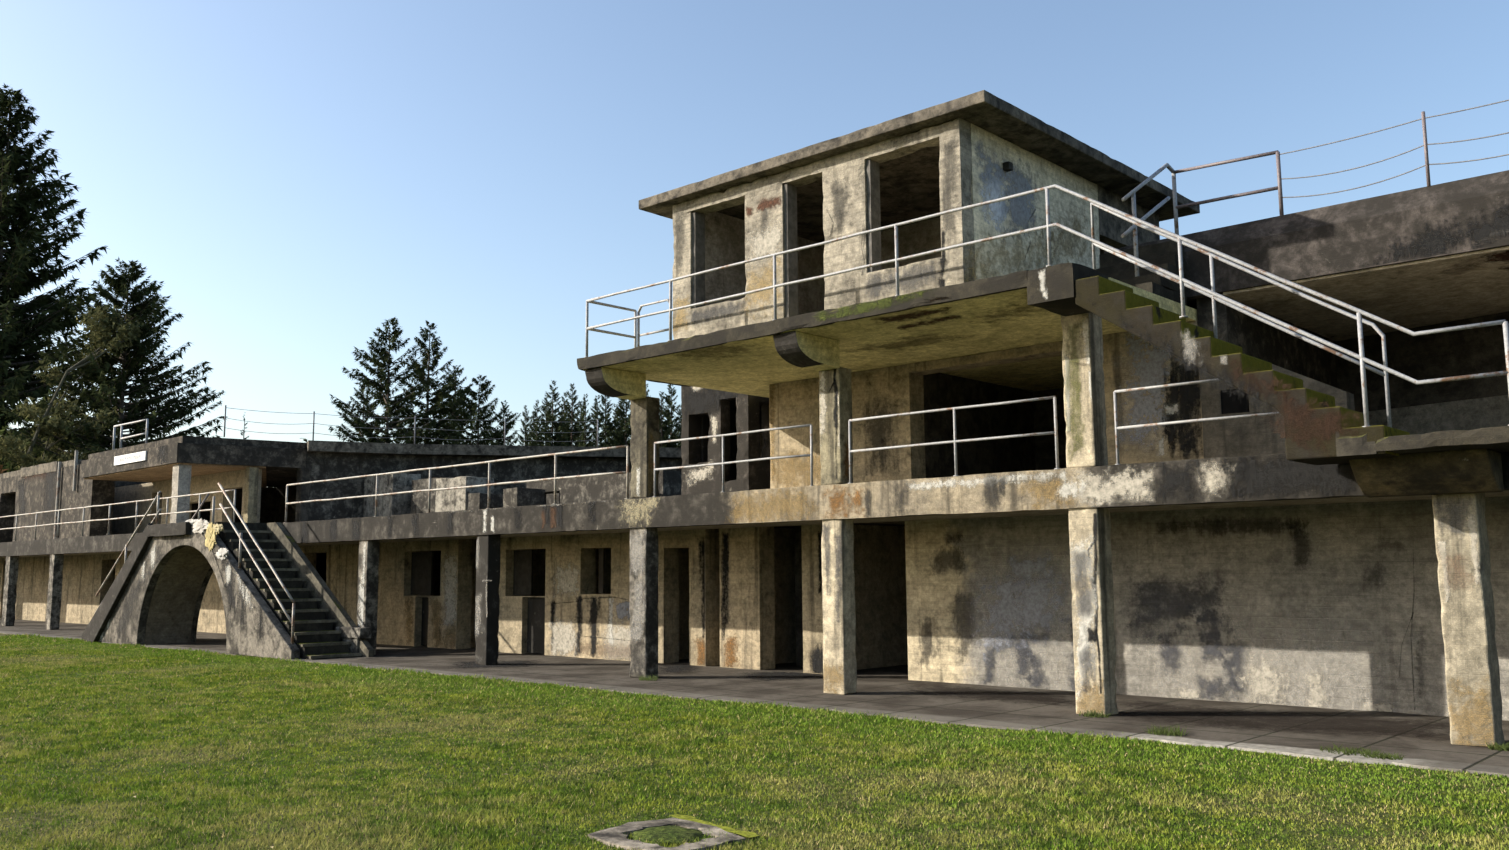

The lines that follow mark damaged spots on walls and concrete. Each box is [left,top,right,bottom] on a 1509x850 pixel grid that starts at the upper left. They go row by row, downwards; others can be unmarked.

damp [1157,519,1309,565]
damp [574,596,613,657]
damp [921,619,932,662]
damp [953,593,975,656]